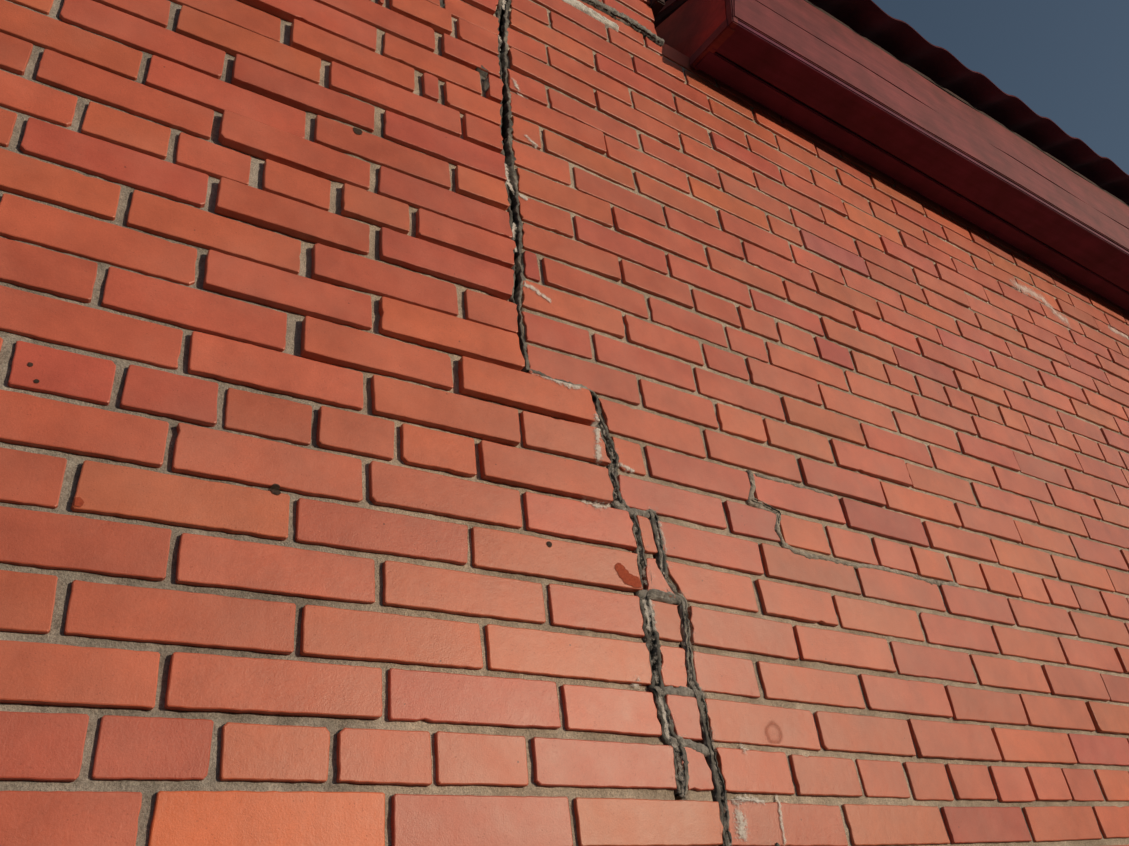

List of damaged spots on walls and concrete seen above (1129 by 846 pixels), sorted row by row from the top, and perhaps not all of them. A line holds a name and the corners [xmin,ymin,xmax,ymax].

crack [494,0,786,846]